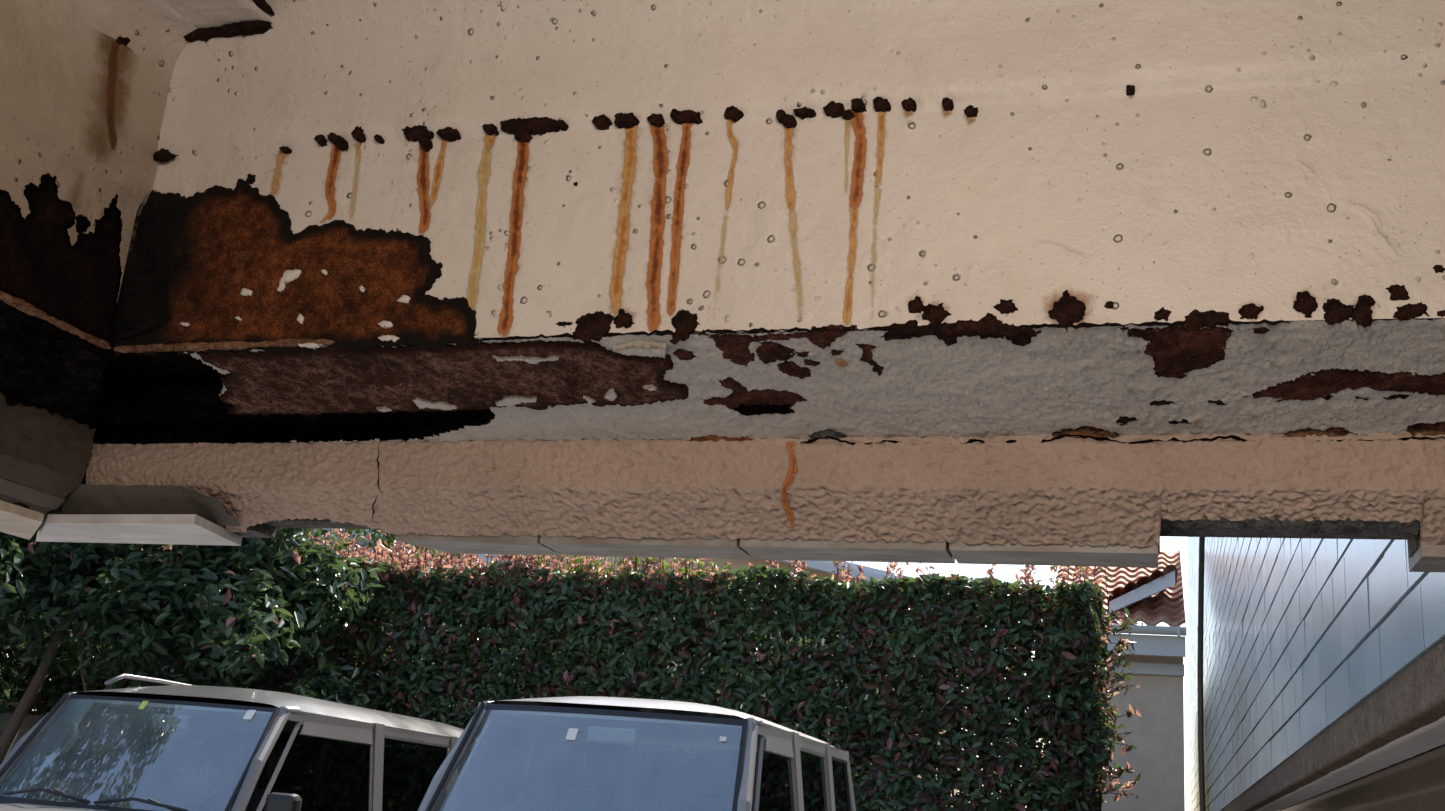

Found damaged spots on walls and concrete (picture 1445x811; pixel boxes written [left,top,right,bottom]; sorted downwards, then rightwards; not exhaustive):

rust [942,97,979,123]
rust [776,97,917,325]
rust [0,109,703,416]
peeling [0,291,335,353]
spalling [92,383,486,425]
peeling [680,313,1041,416]
rust [908,296,952,326]
rust [1046,290,1086,331]
peeling [1116,400,1200,426]
peeling [1118,309,1234,379]
peeling [1243,368,1445,402]
rust [1293,284,1445,328]